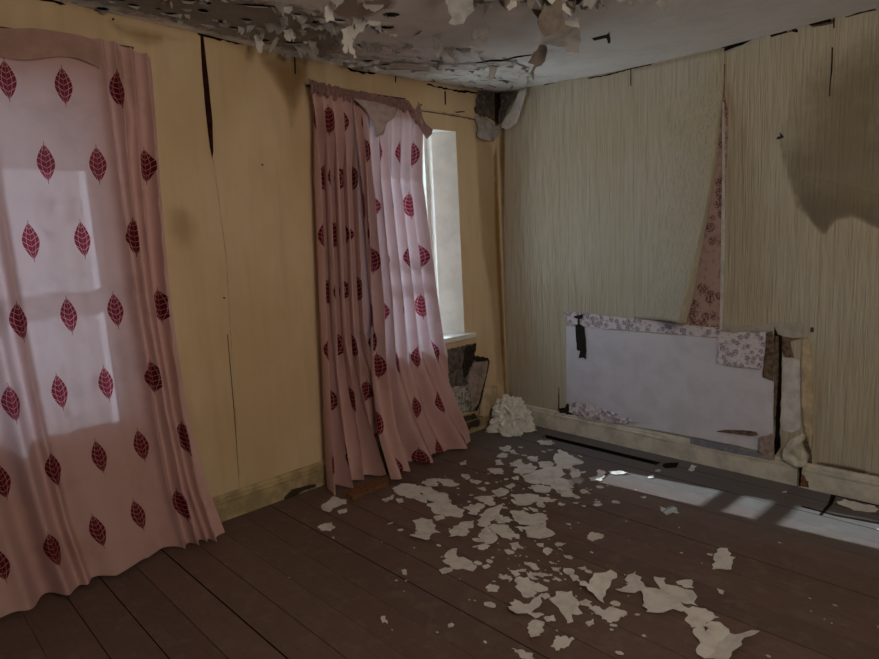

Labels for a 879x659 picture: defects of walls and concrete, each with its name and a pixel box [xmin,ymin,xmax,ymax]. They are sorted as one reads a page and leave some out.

crack [198,33,244,157]
peeling [87,0,607,141]
crack [346,67,396,82]
crack [427,84,477,105]
flaking render [447,343,498,417]
flaking render [759,337,814,460]